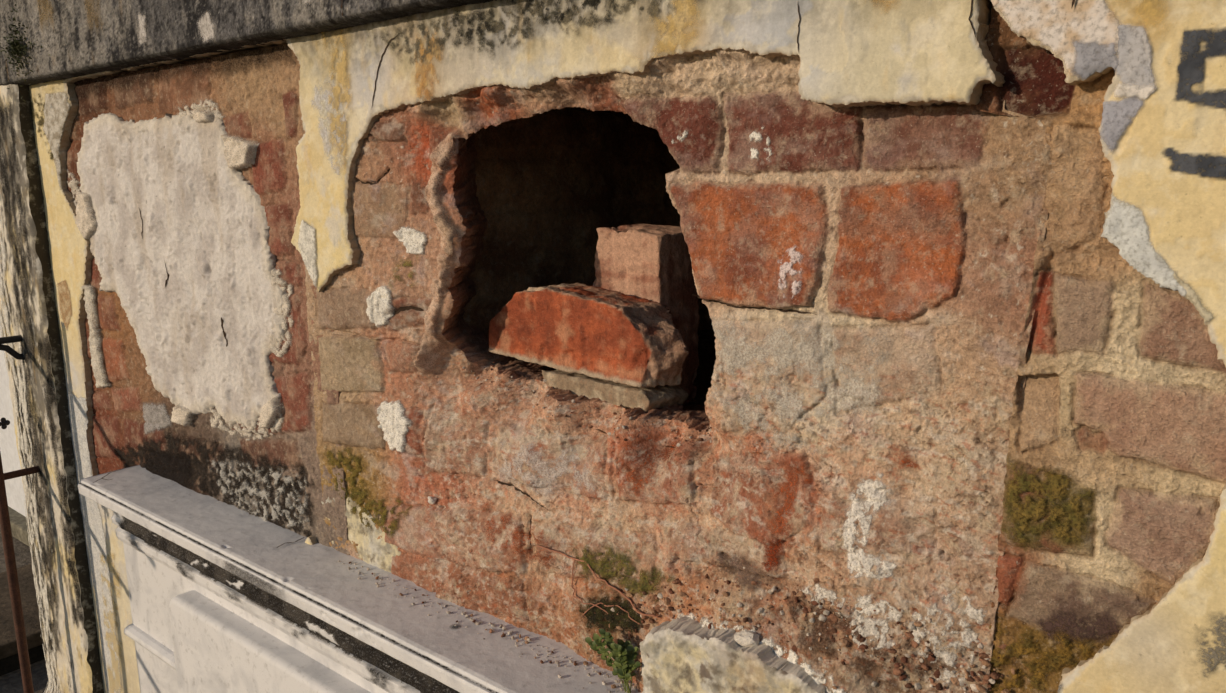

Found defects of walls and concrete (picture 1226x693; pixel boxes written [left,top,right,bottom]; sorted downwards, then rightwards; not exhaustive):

mould [375,0,661,63]
spalling [57,281,72,329]
spalling [66,43,363,560]
spalling [305,0,1226,693]
leakage [115,403,313,537]